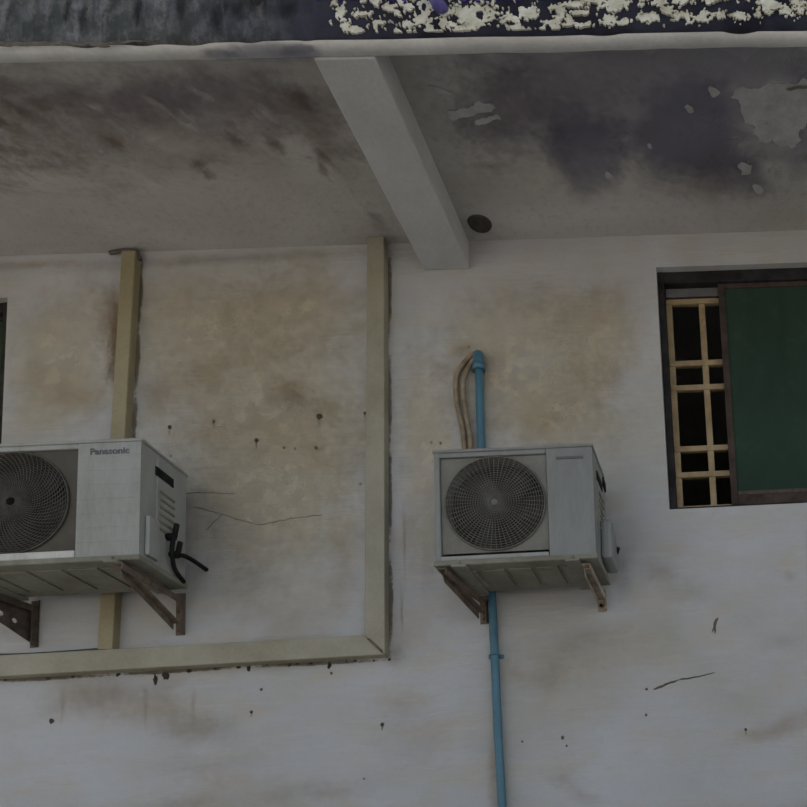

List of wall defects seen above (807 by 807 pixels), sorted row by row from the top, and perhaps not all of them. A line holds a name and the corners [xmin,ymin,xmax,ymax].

peeling [329,0,807,35]
peeling [447,100,501,126]
spalling [731,77,807,149]
crack [186,492,321,530]
crack [654,672,714,690]